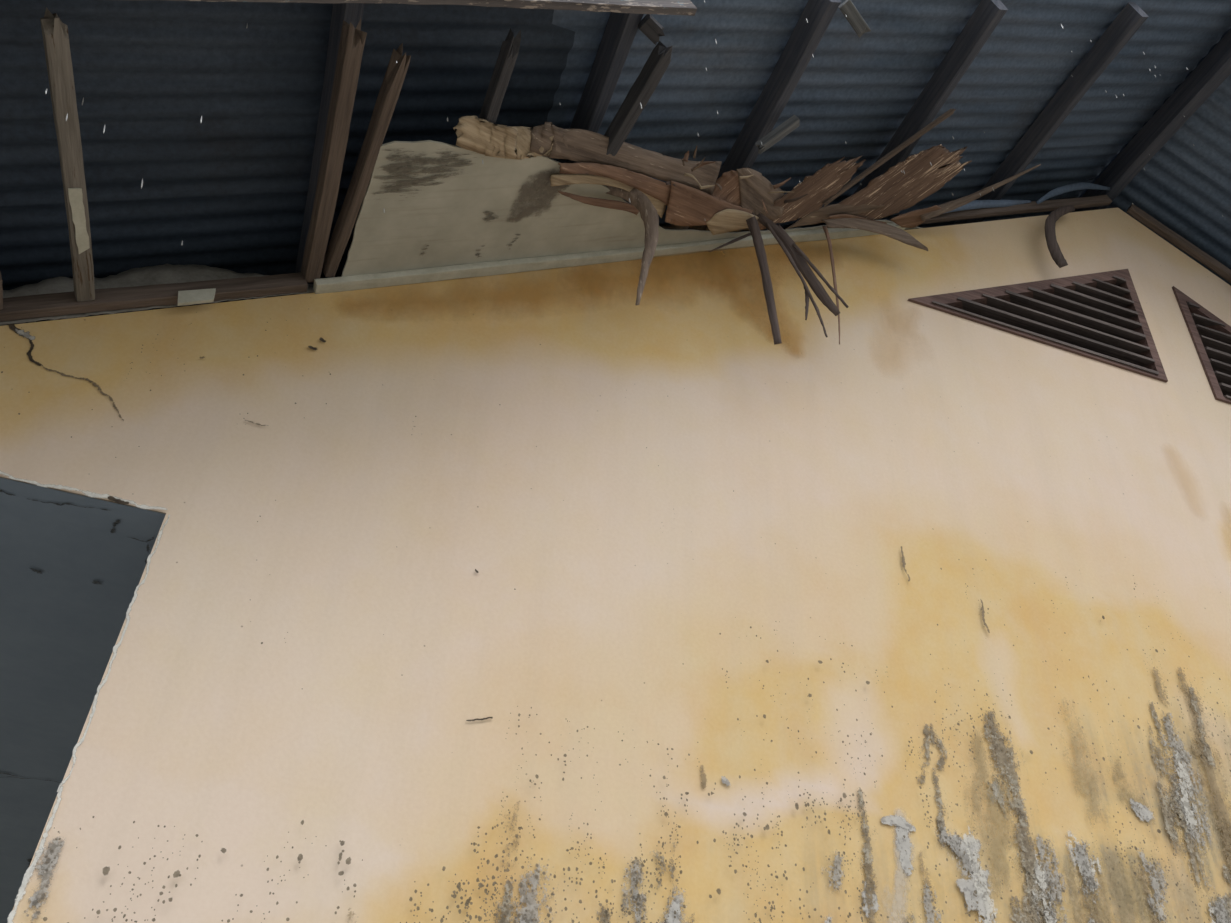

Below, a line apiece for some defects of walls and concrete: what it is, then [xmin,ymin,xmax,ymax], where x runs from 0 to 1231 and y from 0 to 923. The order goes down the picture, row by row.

crack [8,324,123,420]
peeling [0,471,170,923]
peeling [1130,799,1154,822]
water stain [84,825,203,923]
water stain [221,820,363,923]
peeling [822,851,846,890]
peeling [881,810,916,923]
peeling [936,825,998,923]
peeling [1066,831,1101,923]
peeling [1136,848,1168,922]